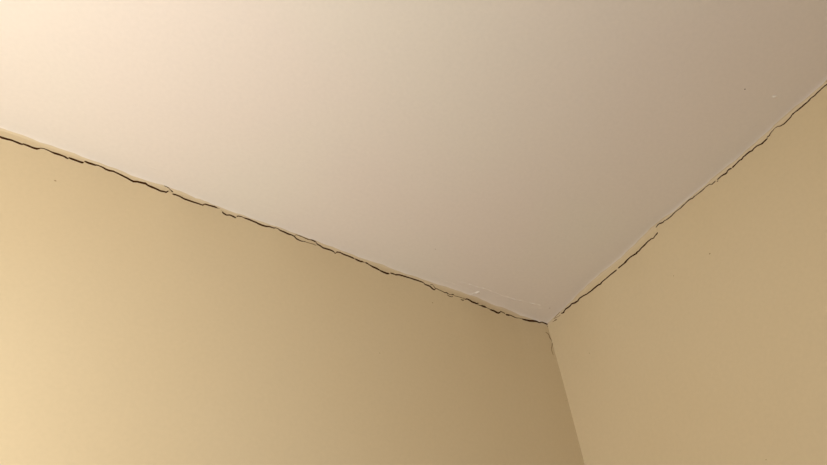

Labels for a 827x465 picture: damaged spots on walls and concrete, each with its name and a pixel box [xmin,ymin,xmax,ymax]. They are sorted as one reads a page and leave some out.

crack [0,84,827,353]